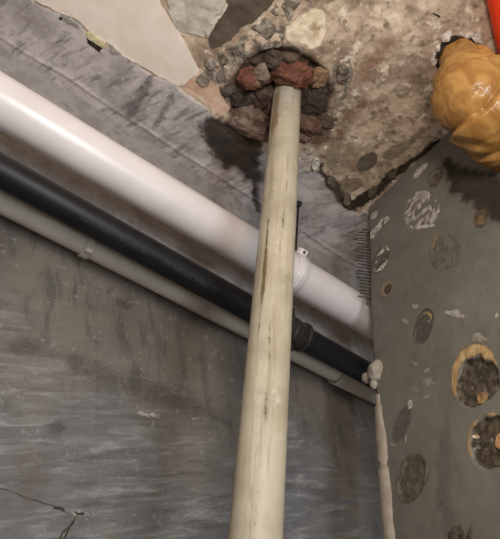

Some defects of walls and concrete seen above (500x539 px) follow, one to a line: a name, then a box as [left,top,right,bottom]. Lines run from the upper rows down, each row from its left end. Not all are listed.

spalling [431,28,485,68]
peeling [35,0,440,213]
damp [197,113,266,213]
spalling [404,168,444,229]
damp [440,156,500,225]
spalling [451,343,499,407]
spalling [467,411,500,469]
crack [0,488,89,539]